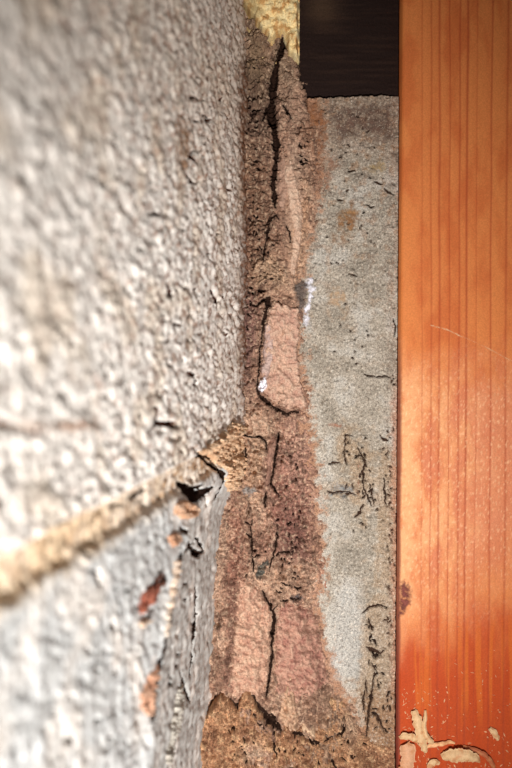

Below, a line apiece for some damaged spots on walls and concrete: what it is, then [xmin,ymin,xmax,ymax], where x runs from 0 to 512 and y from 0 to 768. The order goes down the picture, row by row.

crack [262,37,291,264]
spalling [167,481,213,550]
crack [195,289,299,573]
crack [327,434,374,517]
peeling [135,559,191,637]
peeling [139,663,186,764]
crack [228,590,346,768]
peeling [278,677,304,757]
crack [362,604,386,737]